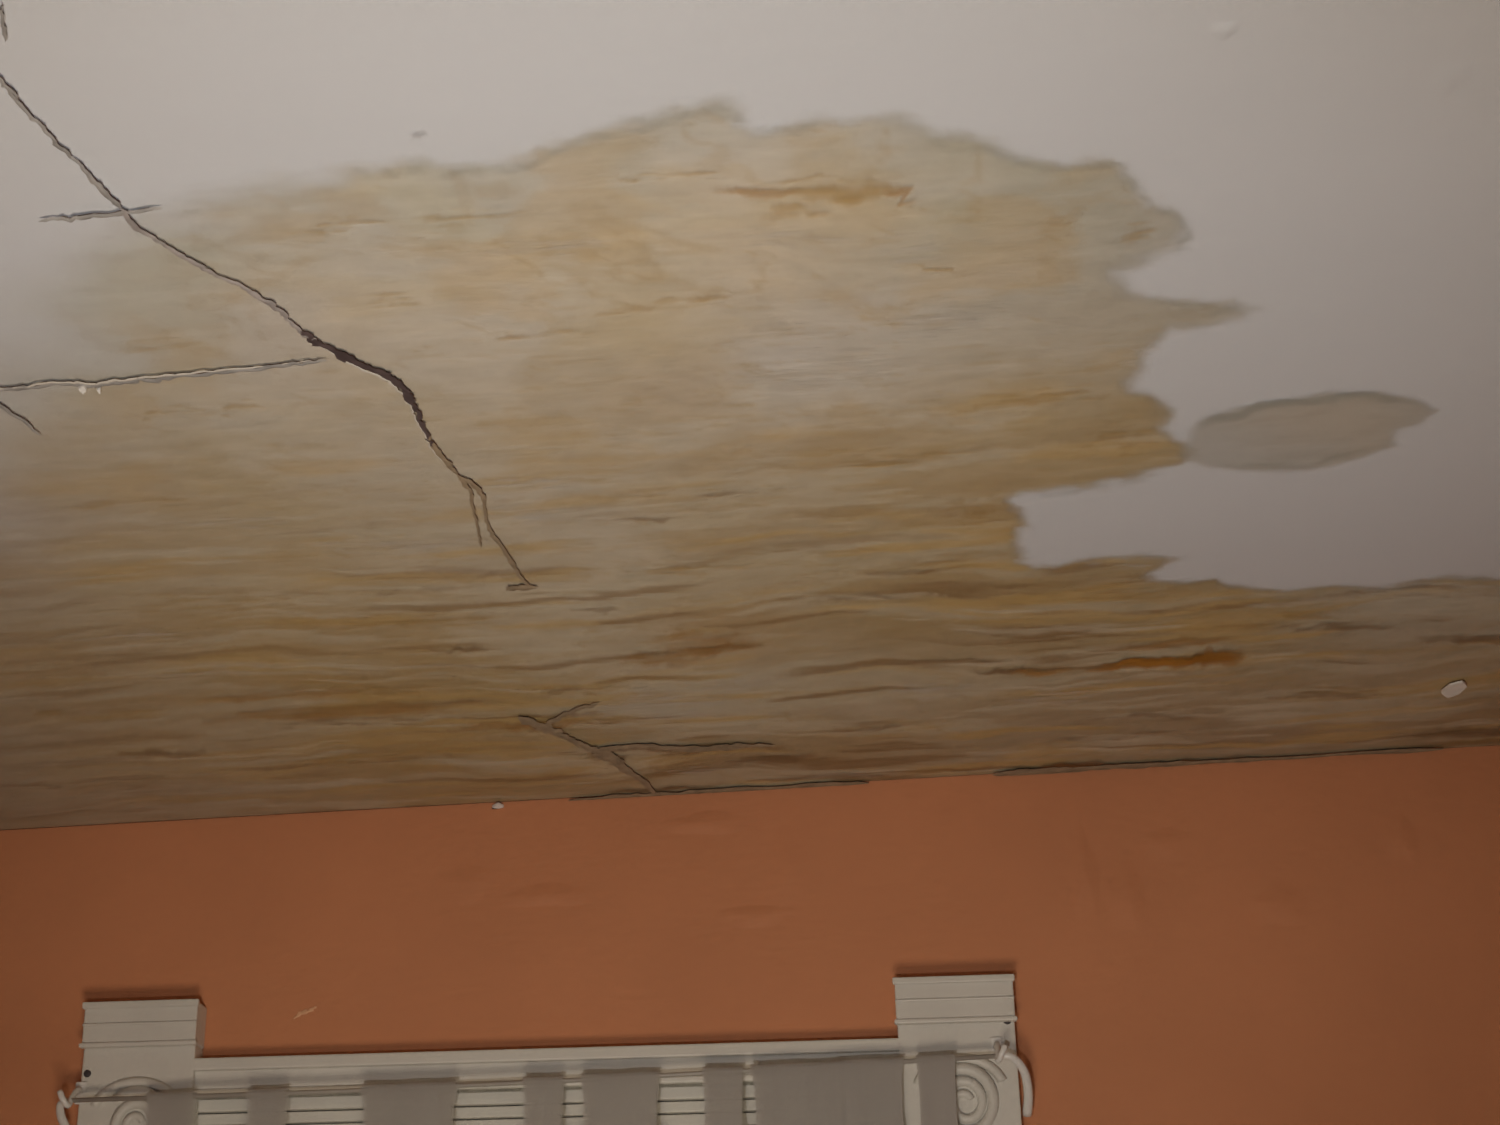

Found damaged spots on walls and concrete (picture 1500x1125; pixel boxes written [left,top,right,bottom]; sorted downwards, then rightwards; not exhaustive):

crack [0,5,538,591]
water stain [0,106,1500,831]